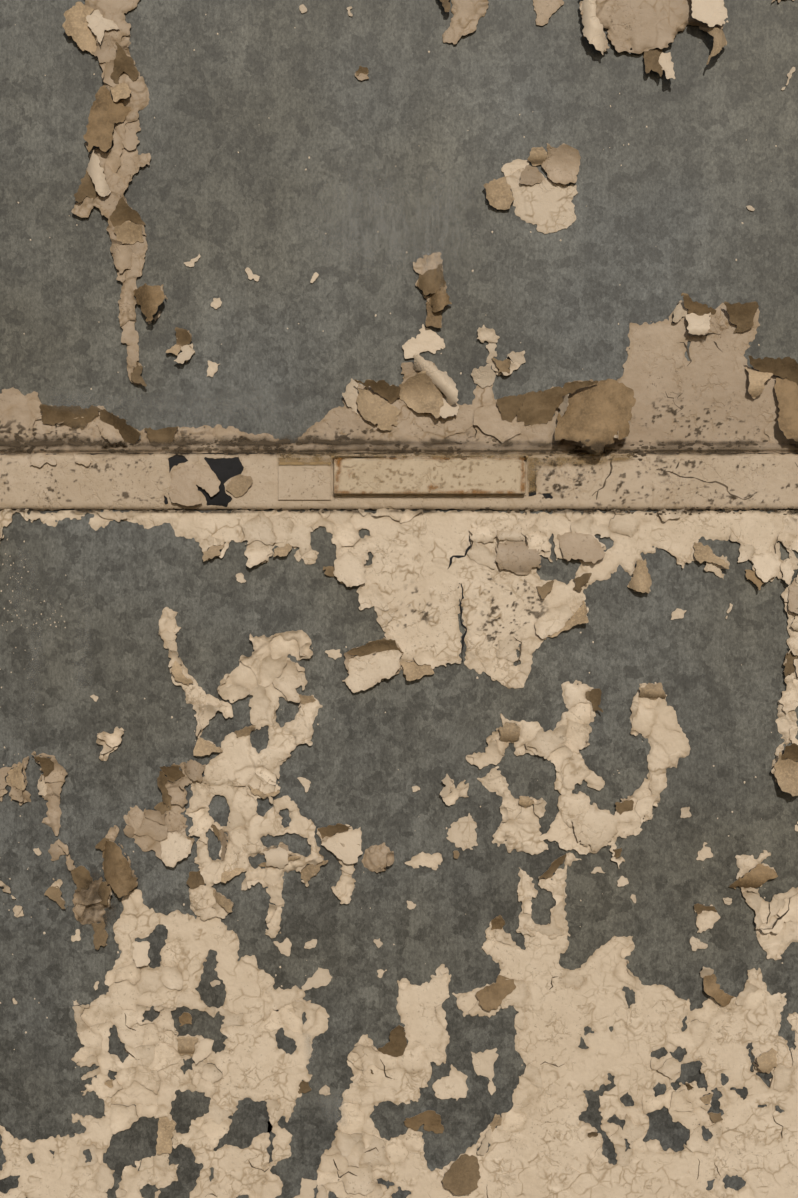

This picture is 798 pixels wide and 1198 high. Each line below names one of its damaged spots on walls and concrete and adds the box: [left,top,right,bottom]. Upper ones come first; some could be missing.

peeling [440,0,489,45]
peeling [533,0,564,26]
peeling [579,0,728,79]
peeling [62,0,167,387]
peeling [483,143,581,234]
peeling [0,252,798,1198]
crack [333,1147,379,1181]